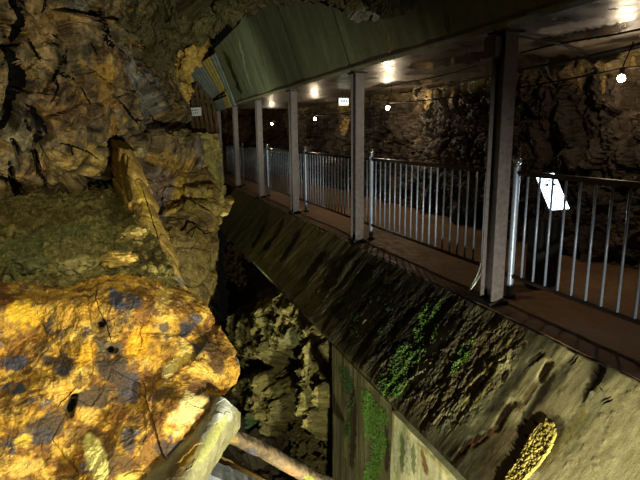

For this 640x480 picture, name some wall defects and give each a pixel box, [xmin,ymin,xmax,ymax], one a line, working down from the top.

leakage [404,312,459,394]
leakage [349,384,357,467]